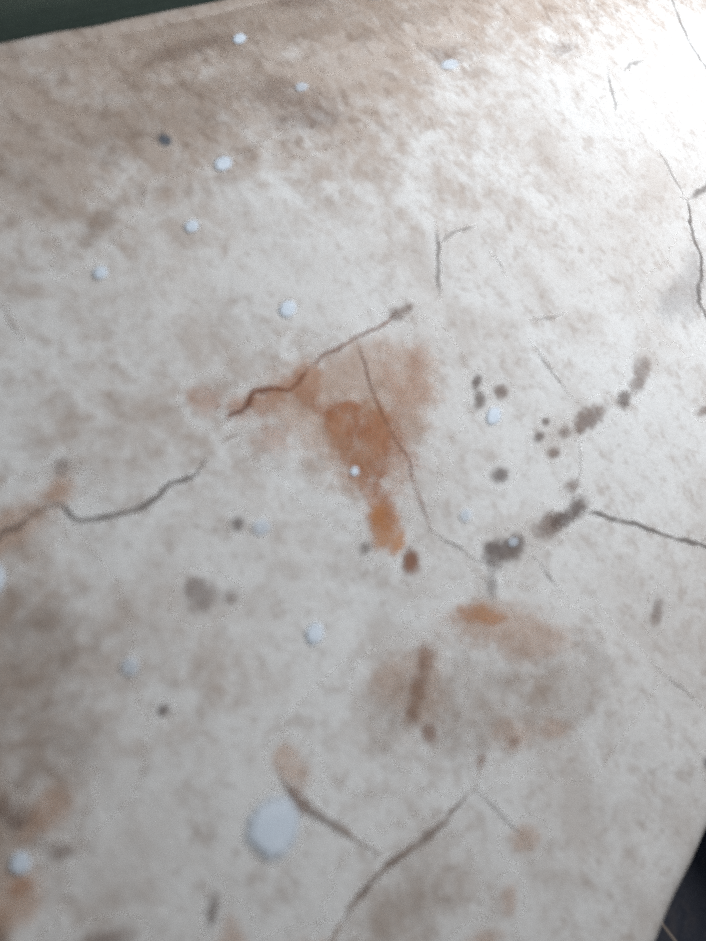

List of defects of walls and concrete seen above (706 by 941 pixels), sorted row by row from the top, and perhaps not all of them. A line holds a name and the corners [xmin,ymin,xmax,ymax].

crack [689,207,703,298]
crack [227,374,304,418]
corrosion [327,403,390,469]
crack [0,468,201,537]
corrosion [372,506,418,571]
water stain [486,537,523,565]
water stain [557,500,585,525]
crack [596,512,706,548]
crack [358,850,409,899]